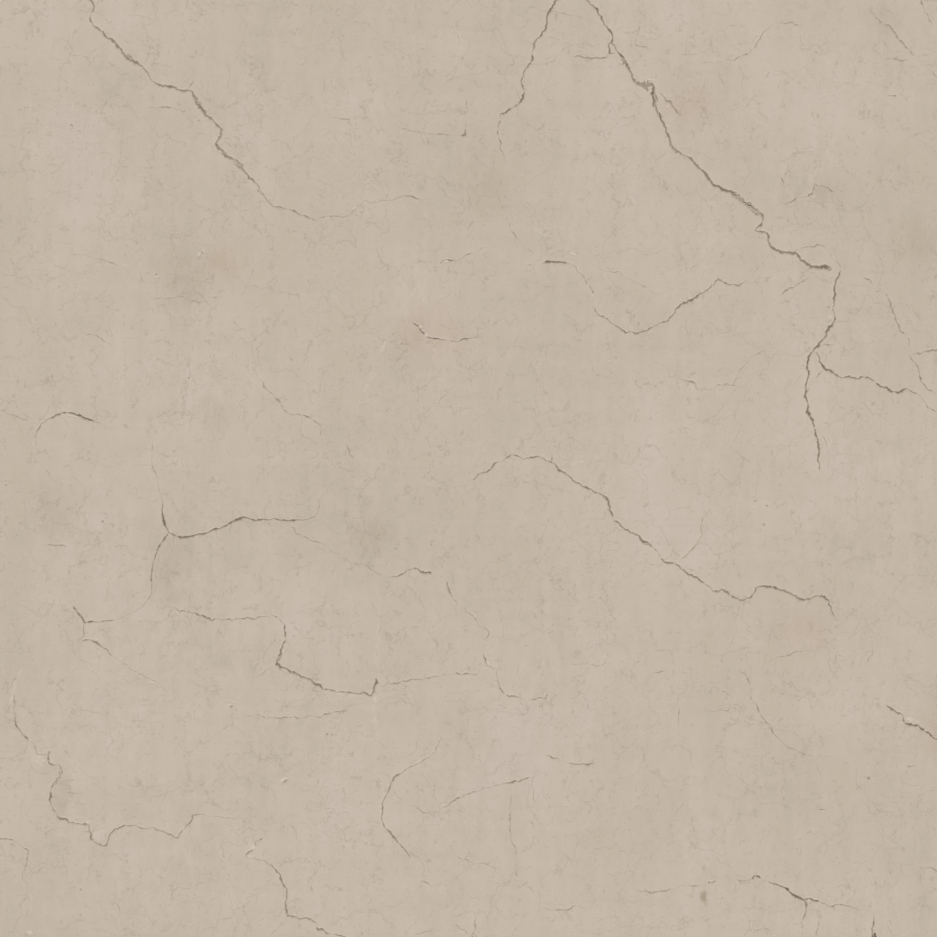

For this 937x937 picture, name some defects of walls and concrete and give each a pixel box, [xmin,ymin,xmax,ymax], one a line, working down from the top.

crack [83,0,427,222]
crack [401,0,937,473]
crack [34,441,550,744]
crack [471,454,851,633]
crack [10,667,246,847]
crack [245,838,348,937]
crack [380,733,444,858]
crack [412,755,596,876]
crack [886,705,937,741]